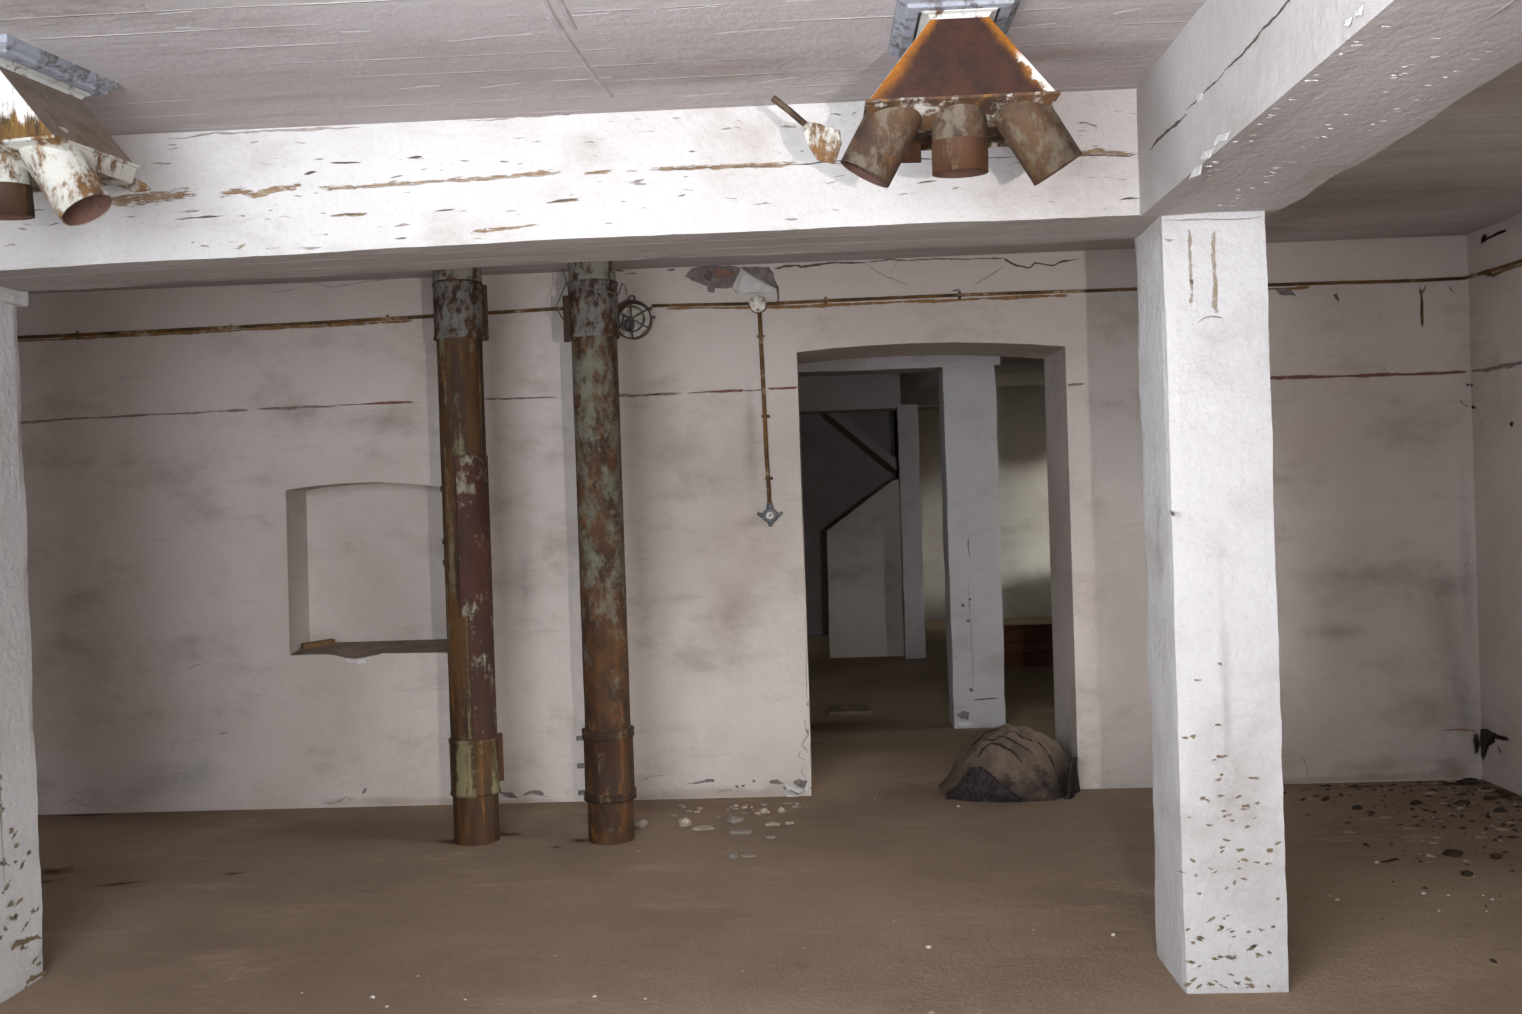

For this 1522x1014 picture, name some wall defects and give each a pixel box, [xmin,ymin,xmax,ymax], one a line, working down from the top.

rust [651,160,841,171]
rust [1079,148,1136,163]
rust [112,188,197,207]
rust [221,184,301,198]
rust [319,170,557,191]
rust [471,224,535,234]
crack [775,257,1080,291]
crack [1150,217,1258,323]
spalling [1179,755,1281,895]
spalling [0,774,47,988]
spalling [1184,915,1275,989]